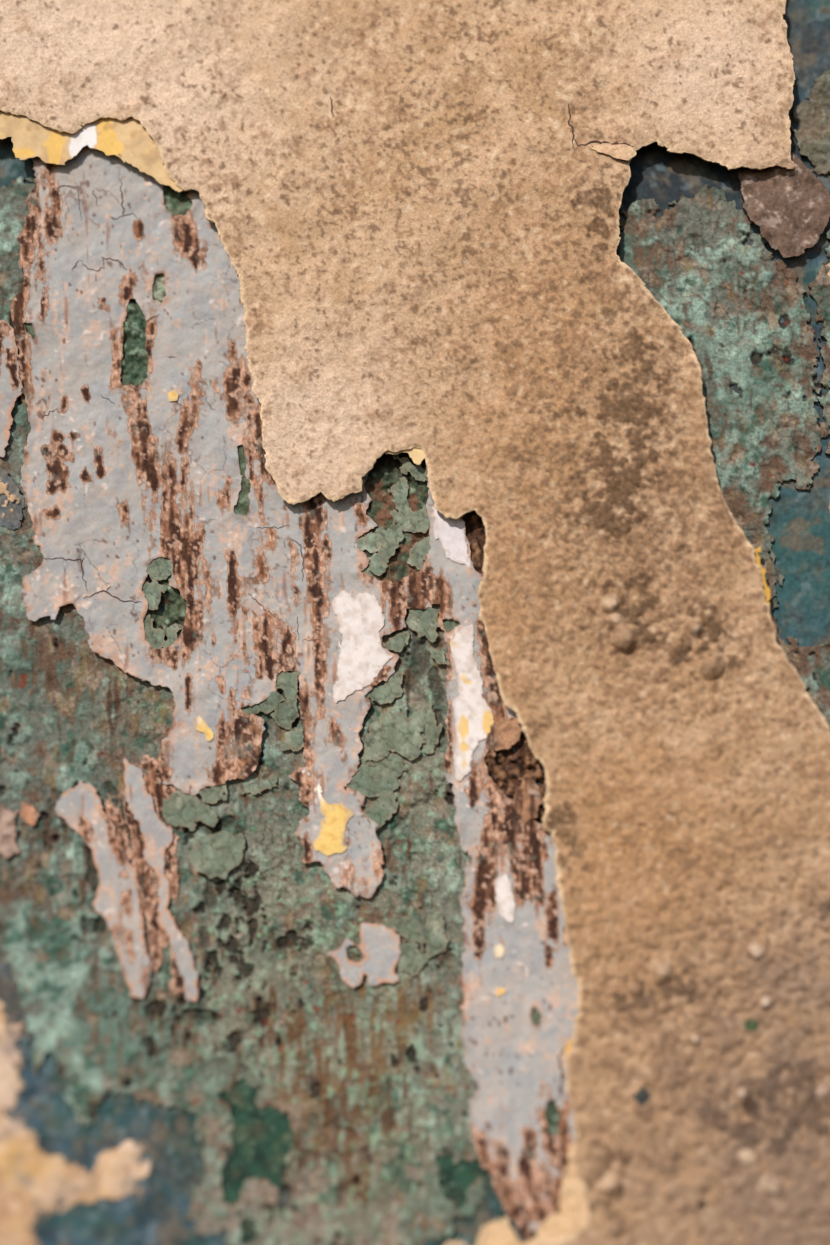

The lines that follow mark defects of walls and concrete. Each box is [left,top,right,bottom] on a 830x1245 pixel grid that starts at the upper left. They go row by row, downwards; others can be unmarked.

corrosion [0,163,63,407]
flaking render [0,111,184,193]
flaking render [589,143,637,161]
peeling [738,70,830,259]
corrosion [41,430,106,520]
peeling [19,146,393,898]
corrosion [110,309,347,863]
peeling [616,184,830,726]
corrosion [78,742,185,993]
peeling [0,393,585,1245]
corrosion [465,748,567,969]
corrosion [472,1080,572,1239]